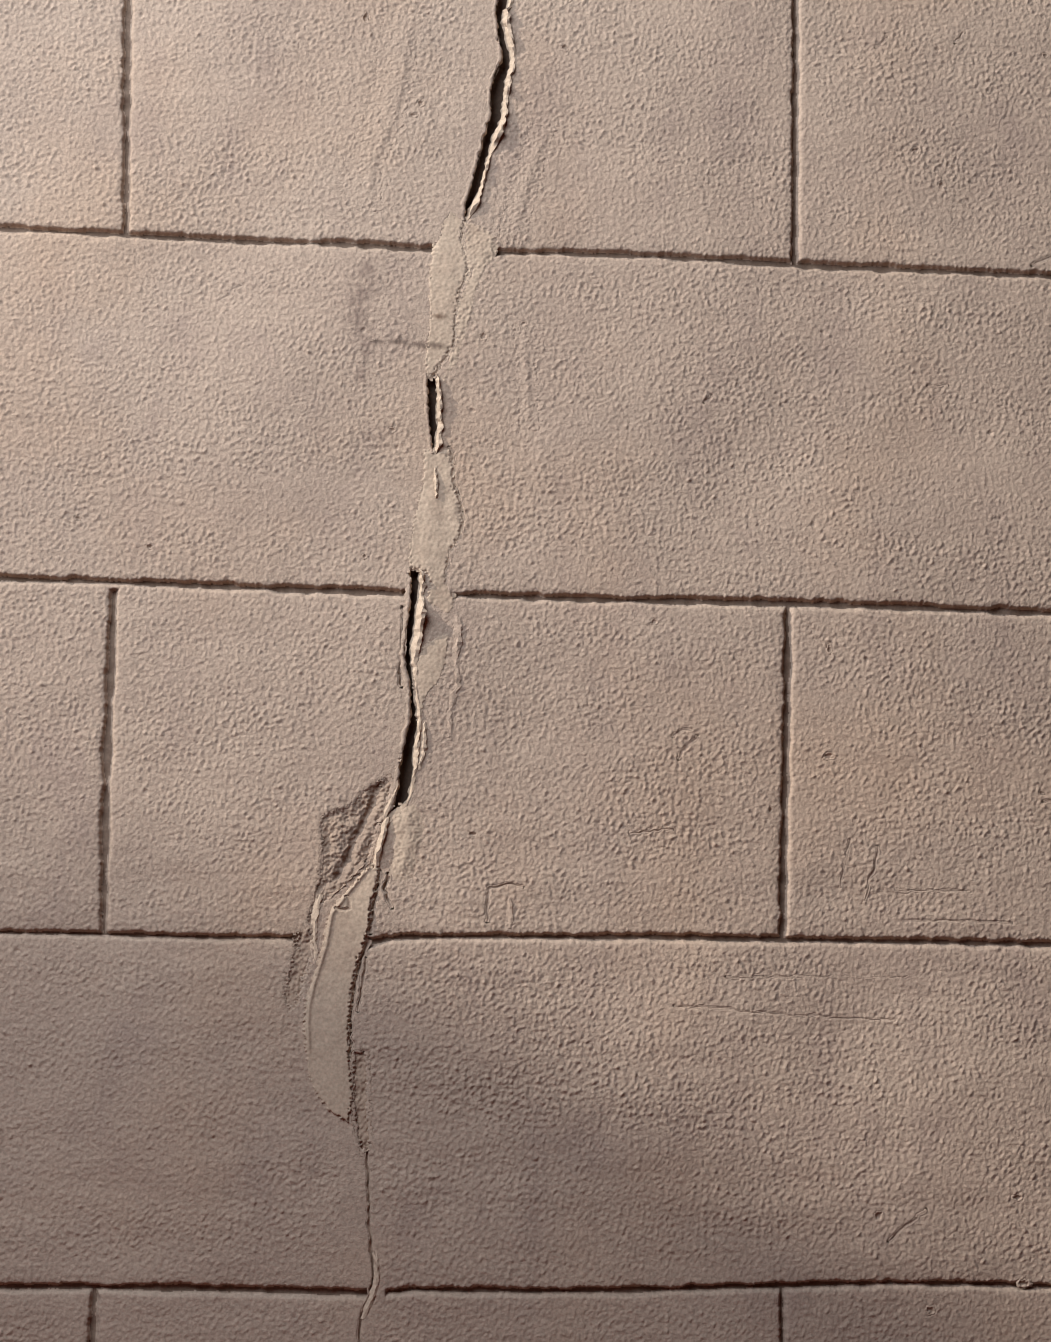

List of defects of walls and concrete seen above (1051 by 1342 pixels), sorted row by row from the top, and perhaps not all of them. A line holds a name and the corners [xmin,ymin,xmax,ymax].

crack [347,0,516,1056]
crack [310,894,323,962]
spalling [280,773,394,1013]
crack [357,1147,380,1342]